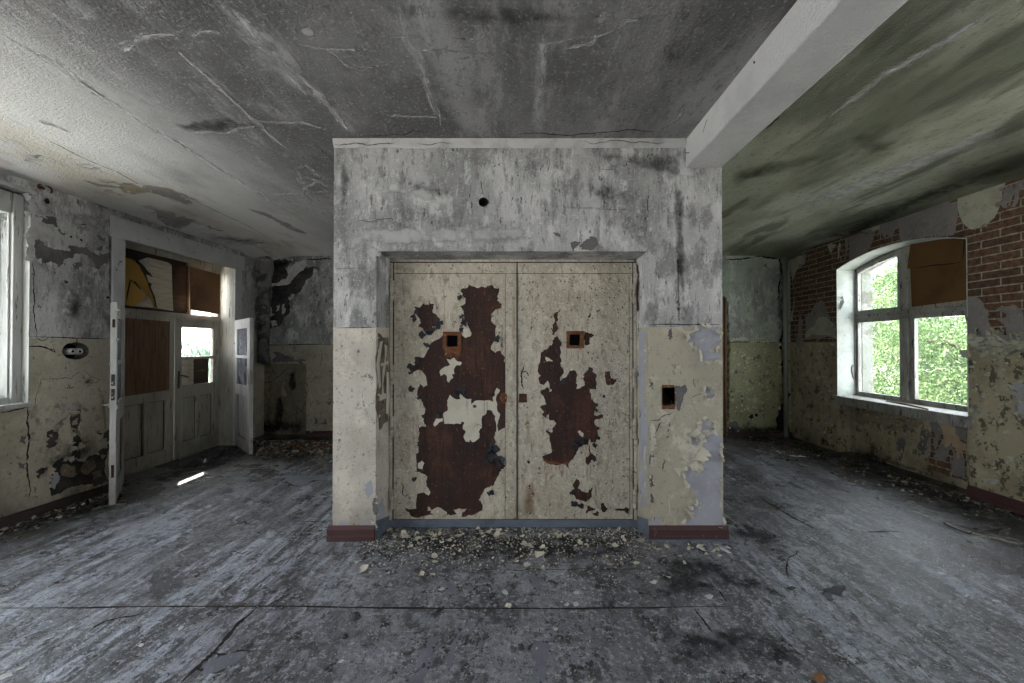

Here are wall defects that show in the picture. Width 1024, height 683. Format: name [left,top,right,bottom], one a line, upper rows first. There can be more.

damp [629,158,670,170]
spalling [31,213,110,273]
spalling [553,232,598,251]
flaking render [957,183,1005,230]
spalling [270,258,319,329]
peeling [16,338,119,496]
peeling [637,329,657,508]
peeling [895,327,1024,485]
peeling [674,416,727,528]